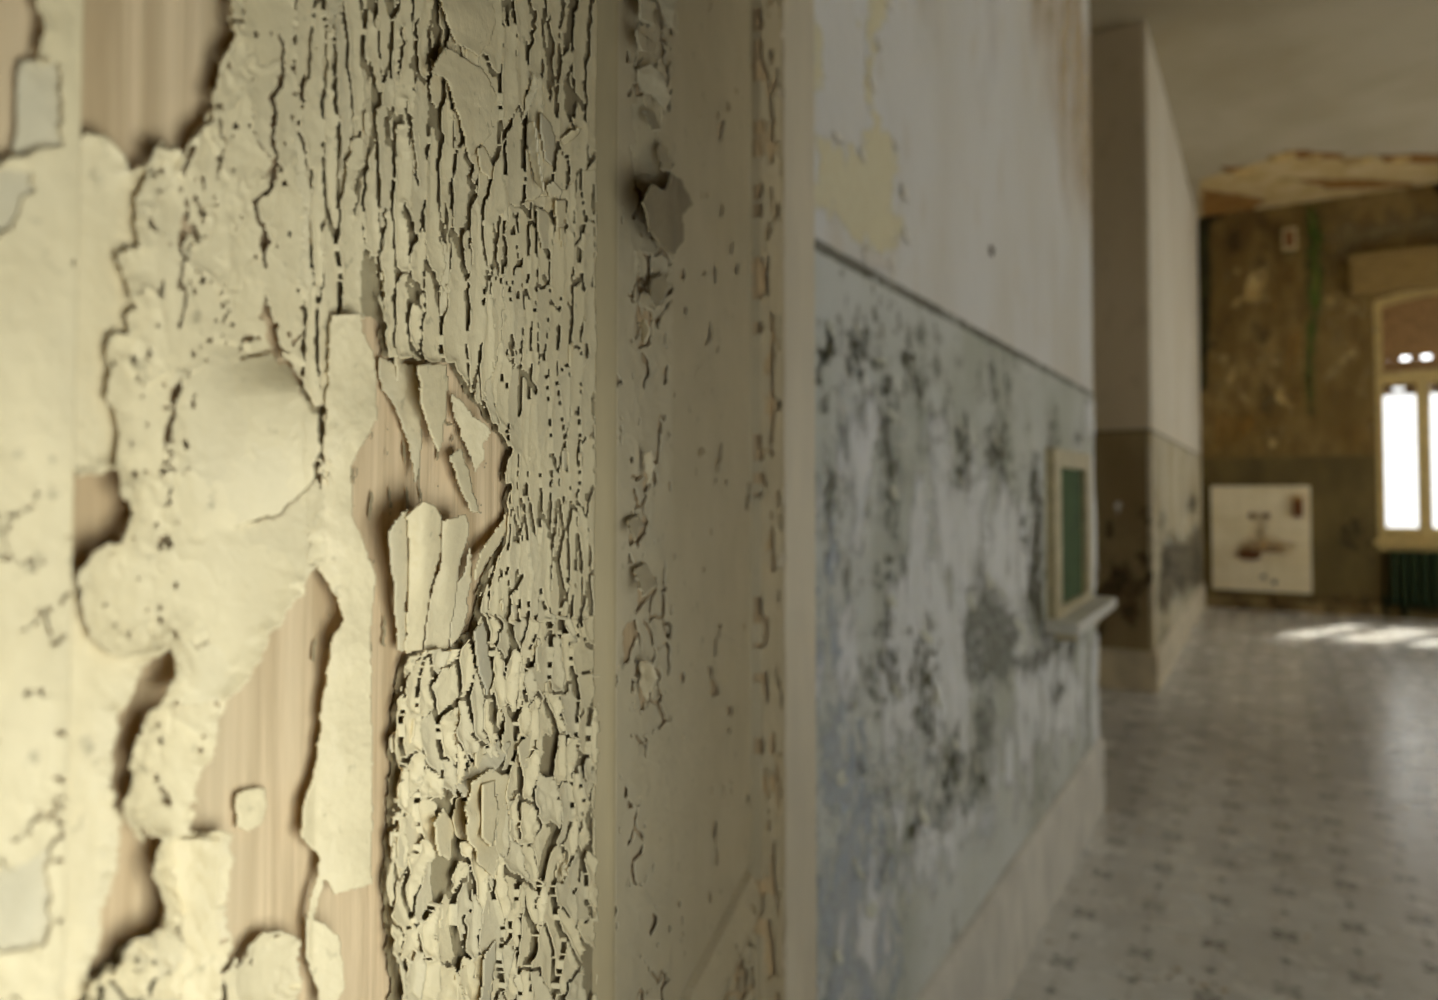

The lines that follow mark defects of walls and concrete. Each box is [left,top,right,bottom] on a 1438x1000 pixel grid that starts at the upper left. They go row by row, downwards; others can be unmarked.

flaking render [1197,150,1438,217]
crack [291,0,598,625]
damp [815,300,916,416]
damp [1014,406,1084,674]
damp [1097,509,1153,625]